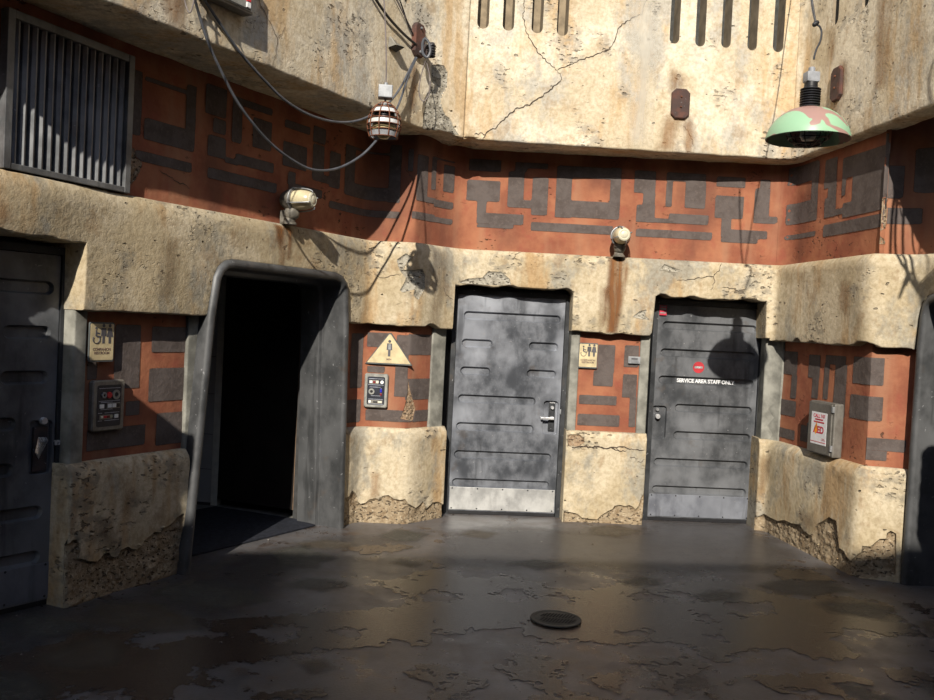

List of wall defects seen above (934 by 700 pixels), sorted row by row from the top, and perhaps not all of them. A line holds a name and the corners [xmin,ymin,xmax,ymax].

flaking render [423,64,459,135]
crack [475,0,647,138]
flaking render [397,254,425,299]
corrosion [605,258,627,332]
flaking render [344,492,442,526]
flaking render [563,494,644,525]
flaking render [63,514,184,608]
flaking render [754,514,896,579]